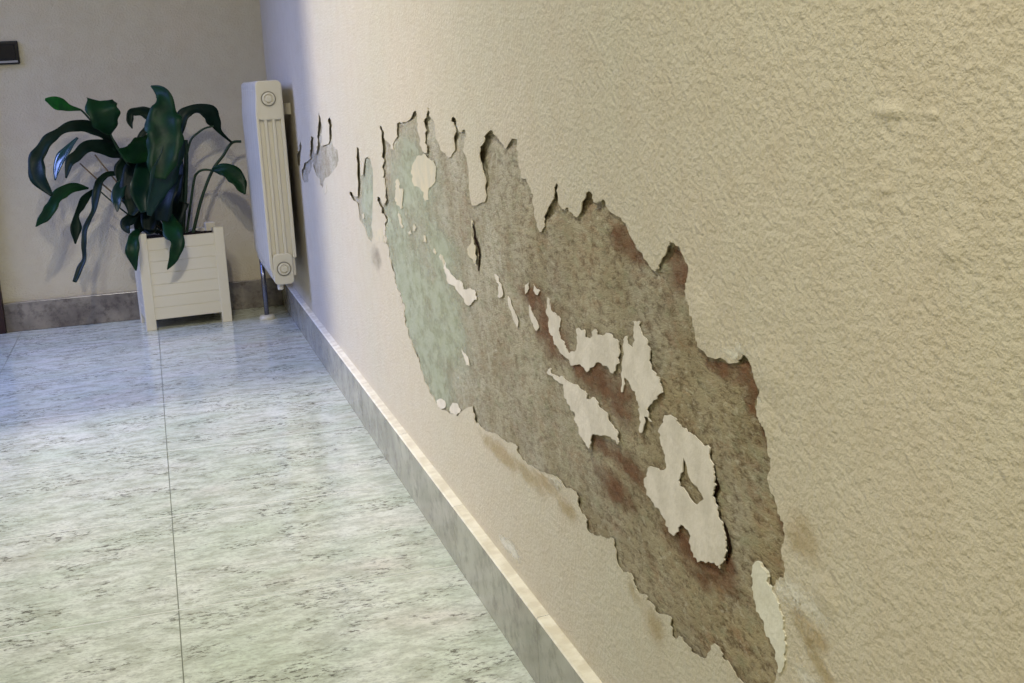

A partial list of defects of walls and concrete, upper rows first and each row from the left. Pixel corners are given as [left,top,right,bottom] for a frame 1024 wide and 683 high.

peeling [297,116,339,195]
peeling [350,108,787,683]